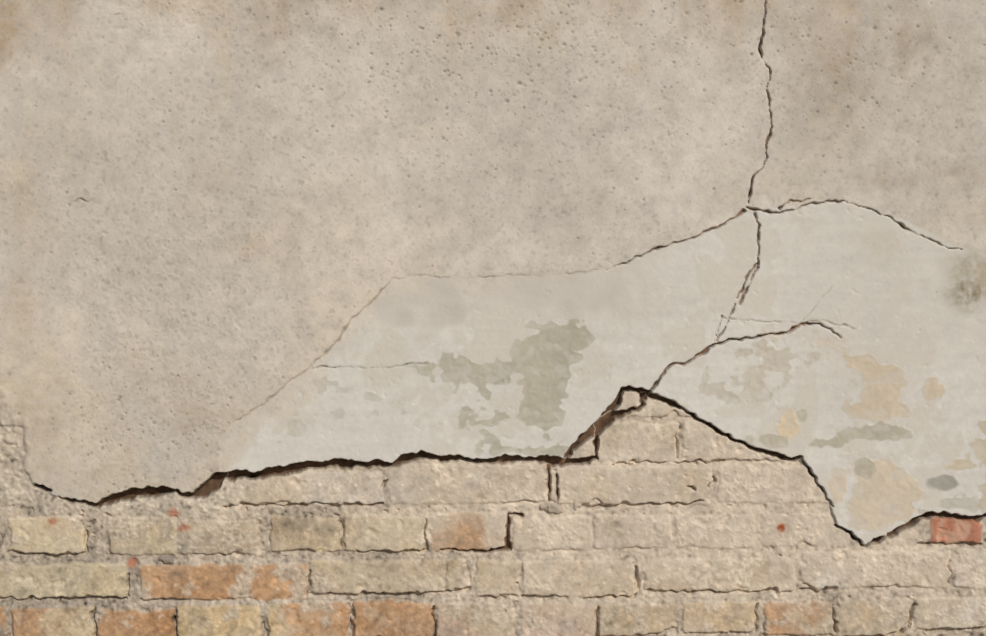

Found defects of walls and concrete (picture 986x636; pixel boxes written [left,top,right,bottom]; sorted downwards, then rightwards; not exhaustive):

crack [33,0,962,509]
flaking render [0,384,35,475]
crack [440,512,524,553]
peeling [404,318,596,458]
peeling [698,317,914,449]
peeling [828,409,986,531]
crack [834,511,986,548]